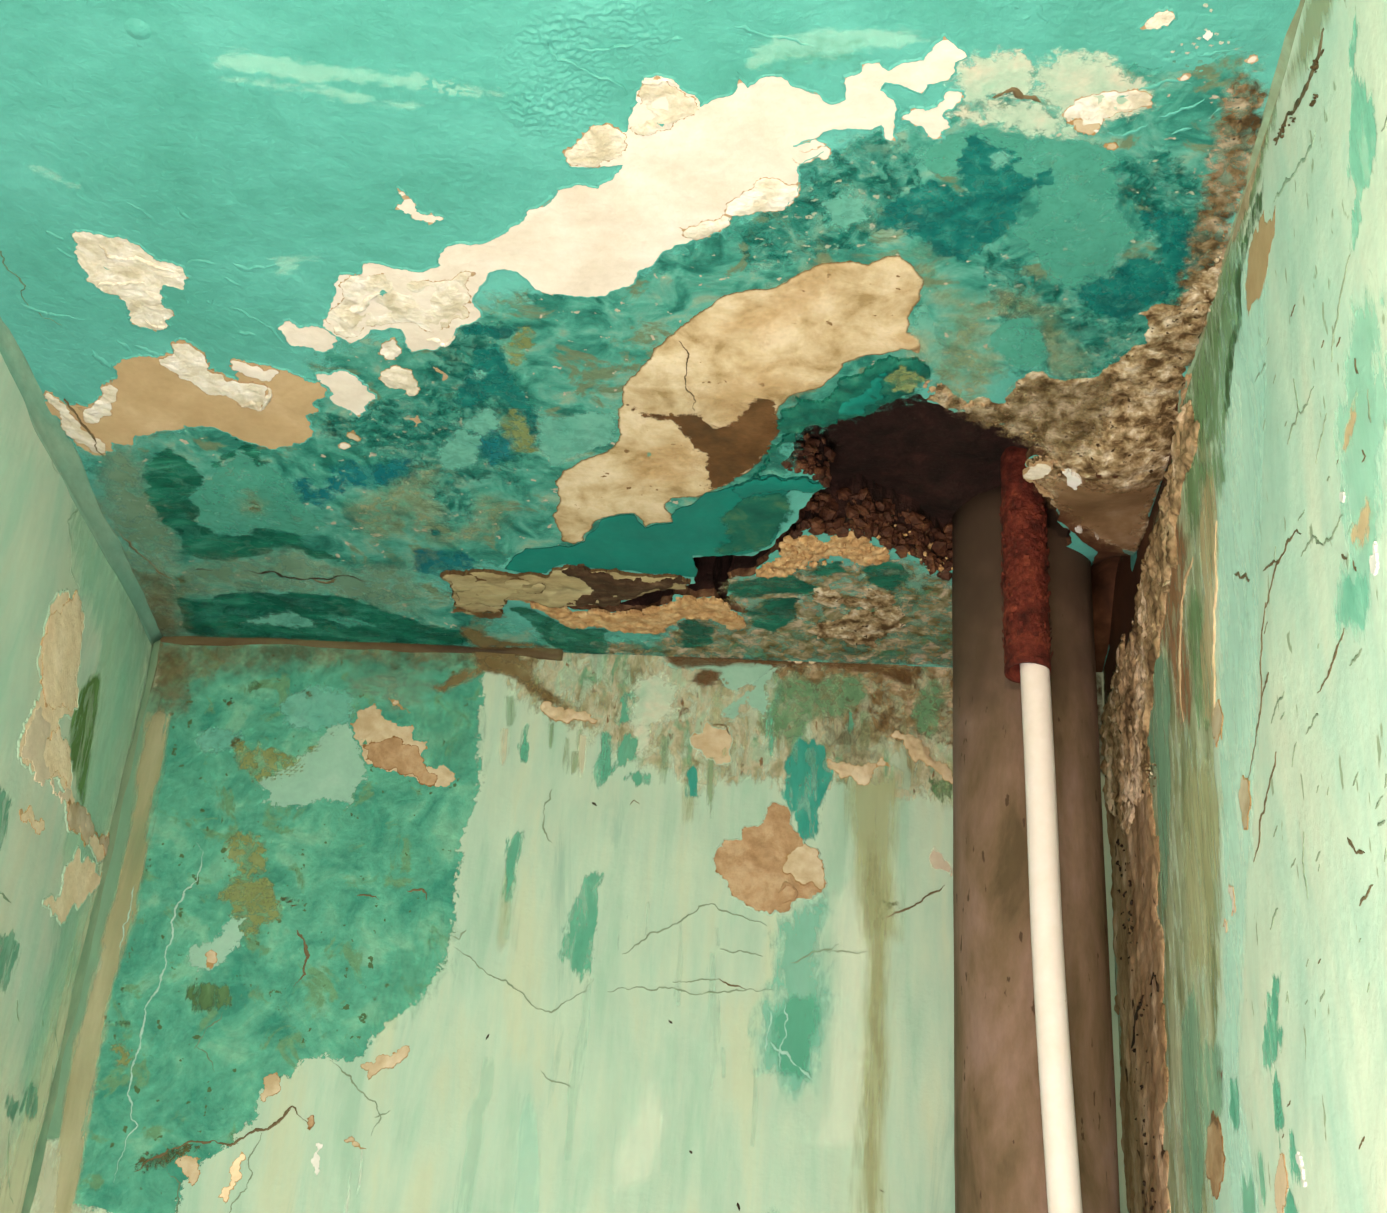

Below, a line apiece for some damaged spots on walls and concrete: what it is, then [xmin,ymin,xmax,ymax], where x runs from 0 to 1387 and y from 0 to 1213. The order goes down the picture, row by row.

peeling [43,33,1153,456]
peeling [552,256,924,544]
crack [1273,28,1324,203]
crack [1255,254,1351,481]
water stain [70,675,100,806]
flaking render [440,564,746,635]
water stain [75,46,1267,1164]
flaking render [926,259,1222,1213]
crack [1234,509,1387,942]
peeling [17,588,170,1213]
crack [453,903,867,1013]
crack [134,1106,308,1213]